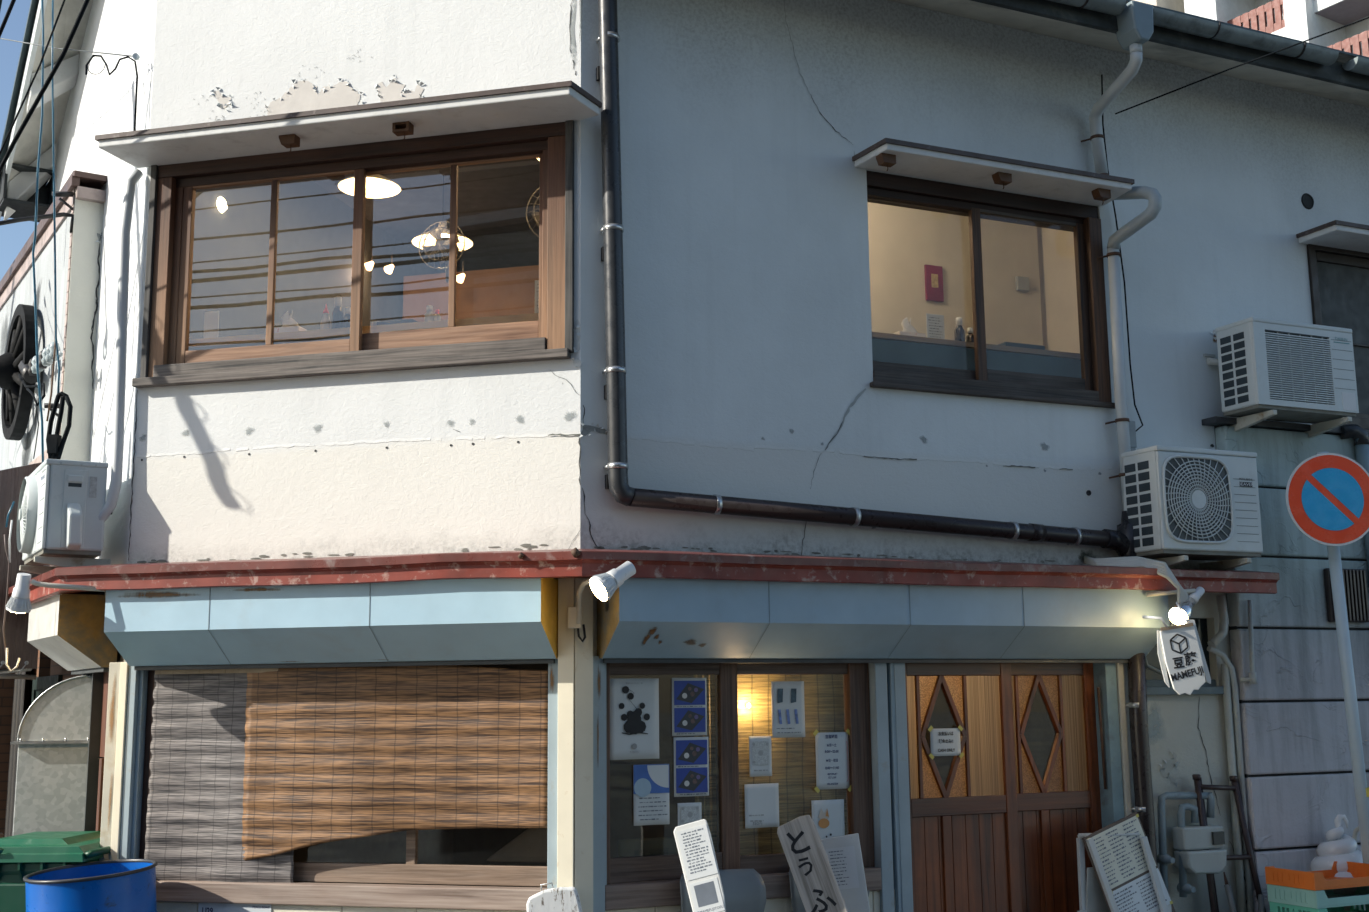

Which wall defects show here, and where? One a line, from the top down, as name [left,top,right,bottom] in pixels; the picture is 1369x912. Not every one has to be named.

peeling [198,65,424,120]
crack [551,371,597,548]
crack [810,388,866,489]